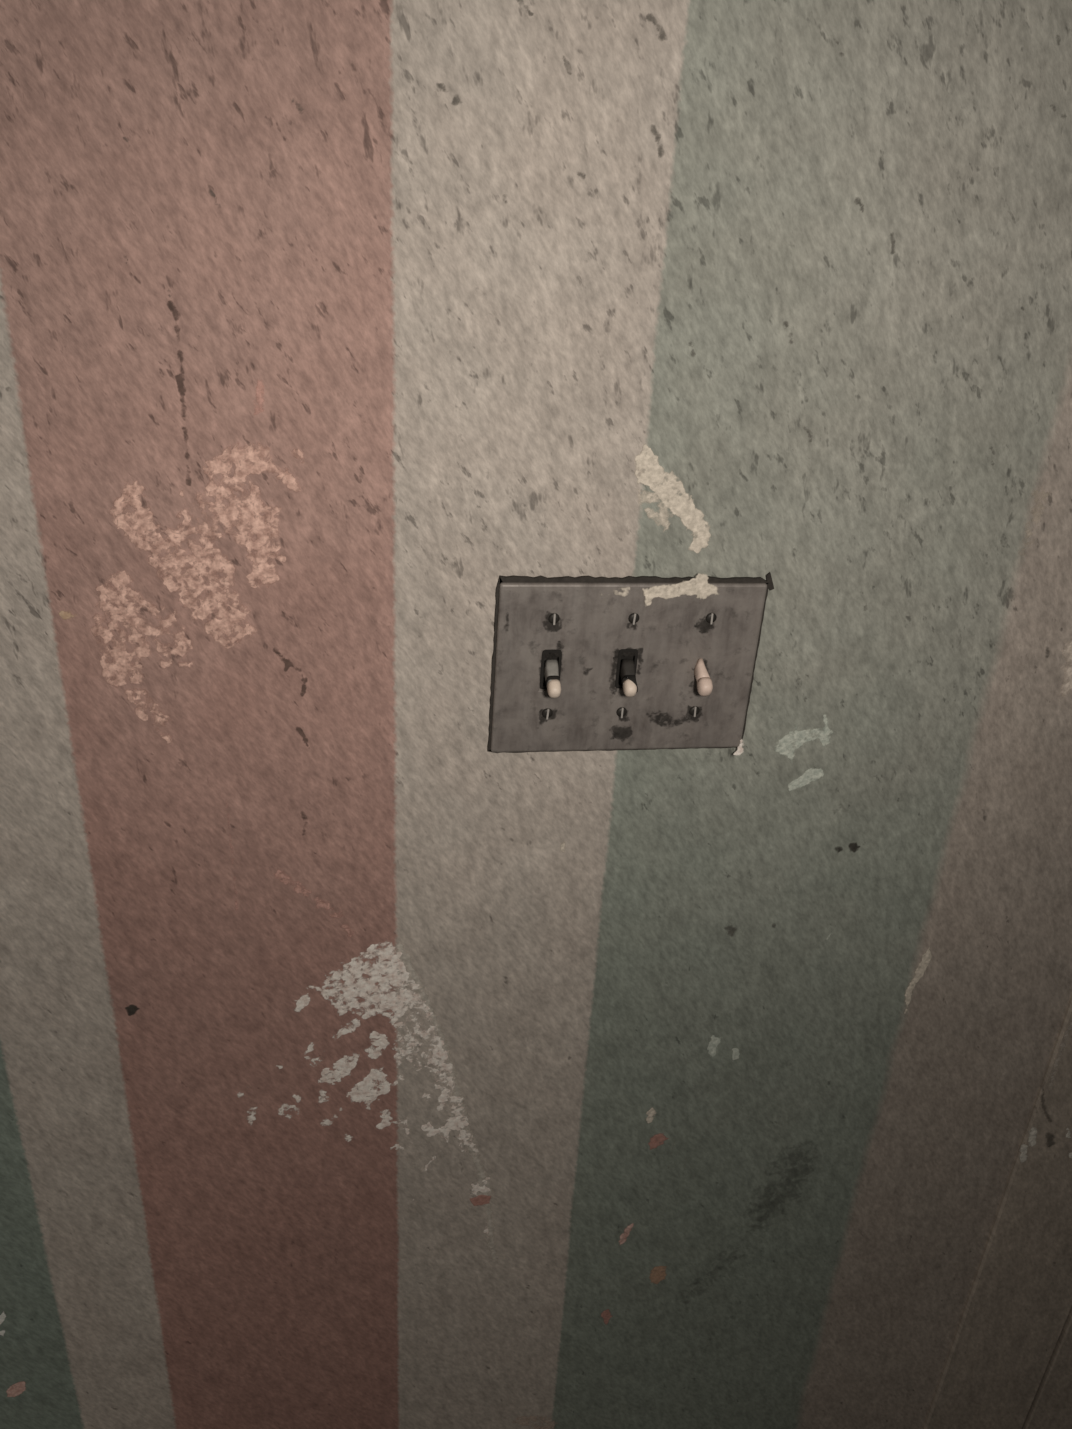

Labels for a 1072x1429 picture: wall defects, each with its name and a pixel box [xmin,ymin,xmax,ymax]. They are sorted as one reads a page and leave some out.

peeling [635,444,711,553]
peeling [91,443,303,743]
peeling [775,714,833,791]
peeling [295,942,479,1156]
peeling [237,1092,257,1125]
peeling [278,1094,301,1119]
peeling [470,1177,491,1206]